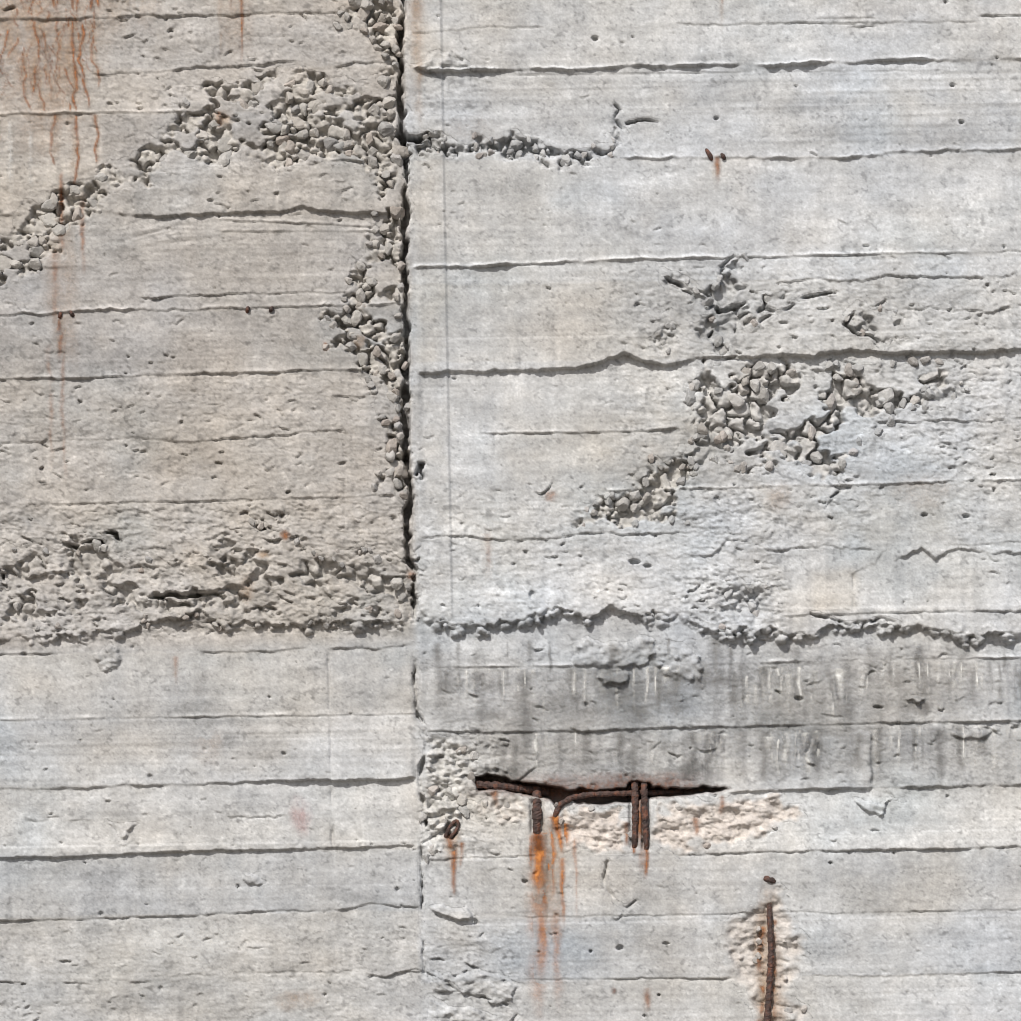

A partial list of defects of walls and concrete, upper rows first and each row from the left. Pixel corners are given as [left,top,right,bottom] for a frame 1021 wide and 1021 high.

corrosion [25,2,95,129]
spalling [418,731,531,864]
corrosion [529,816,568,899]
spalling [543,802,632,857]
corrosion [626,805,648,872]
spalling [648,789,808,860]
spalling [714,882,813,1021]
corrosion [758,921,776,1000]